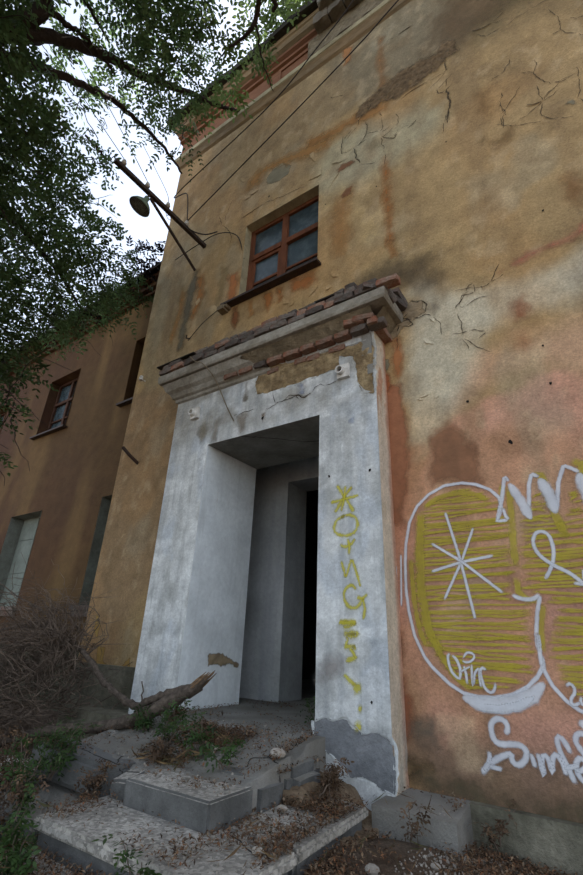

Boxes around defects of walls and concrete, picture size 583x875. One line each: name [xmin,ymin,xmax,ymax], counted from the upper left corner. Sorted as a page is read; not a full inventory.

crack [472,0,583,37]
crack [341,59,453,164]
spalling [356,40,457,118]
crack [494,60,583,127]
crack [397,264,503,352]
spalling [254,339,389,396]
water stain [429,426,478,483]
spalling [208,653,239,668]
spalling [311,714,435,797]